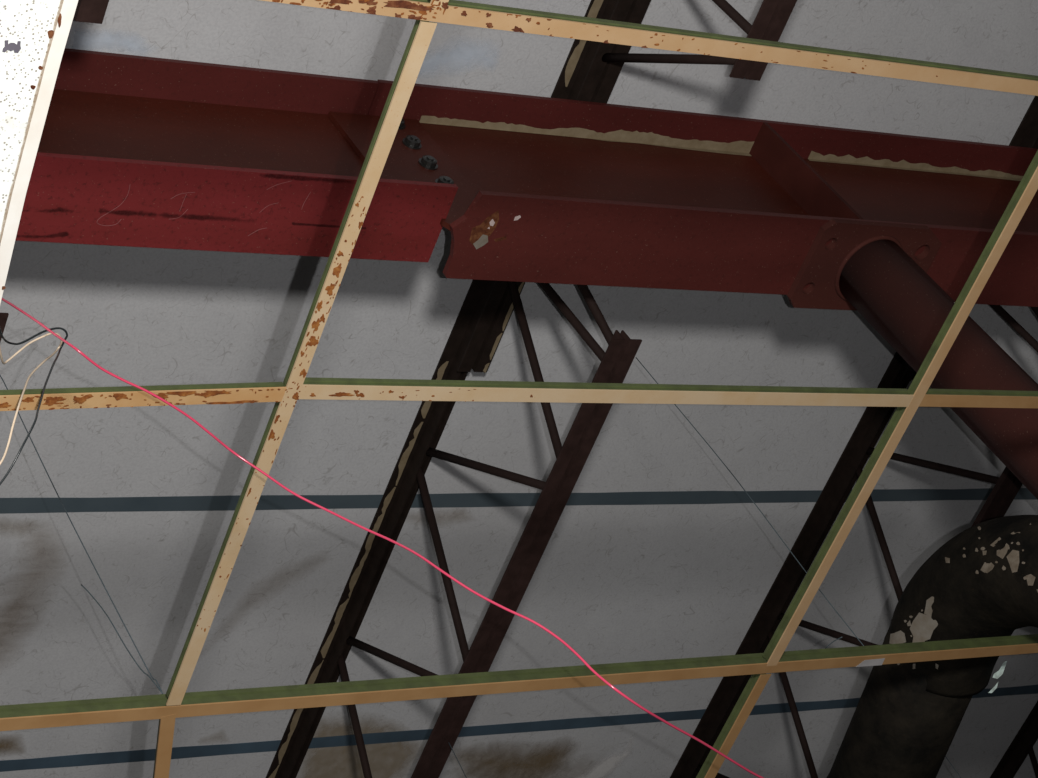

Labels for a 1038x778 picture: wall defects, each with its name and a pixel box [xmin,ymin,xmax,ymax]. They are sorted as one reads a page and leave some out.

corrosion [272,0,493,28]
corrosion [0,0,64,243]
peeling [419,116,755,156]
peeling [808,151,1023,181]
corrosion [0,196,366,463]
peeling [307,401,432,684]
peeling [963,526,1038,592]
peeling [889,597,938,644]
peeling [269,708,303,778]
leakage [478,749,565,776]